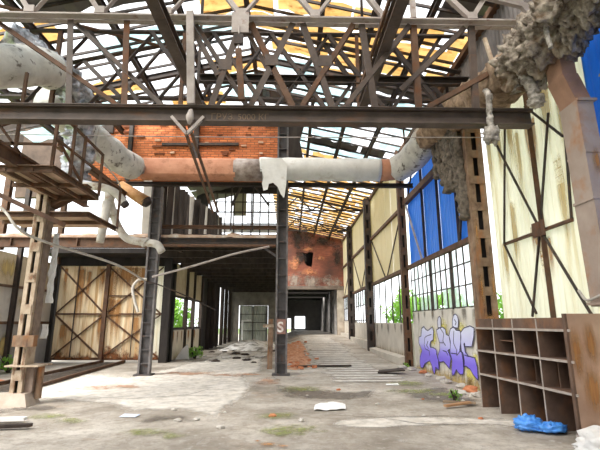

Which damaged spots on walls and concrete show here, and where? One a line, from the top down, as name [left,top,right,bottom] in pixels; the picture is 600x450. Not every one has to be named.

water stain [485,129,522,185]
water stain [556,156,568,235]
water stain [510,203,518,257]
rust [78,269,92,301]
rust [97,267,145,336]
peeling [288,257,341,290]
rust [54,351,92,360]
rust [102,346,138,359]